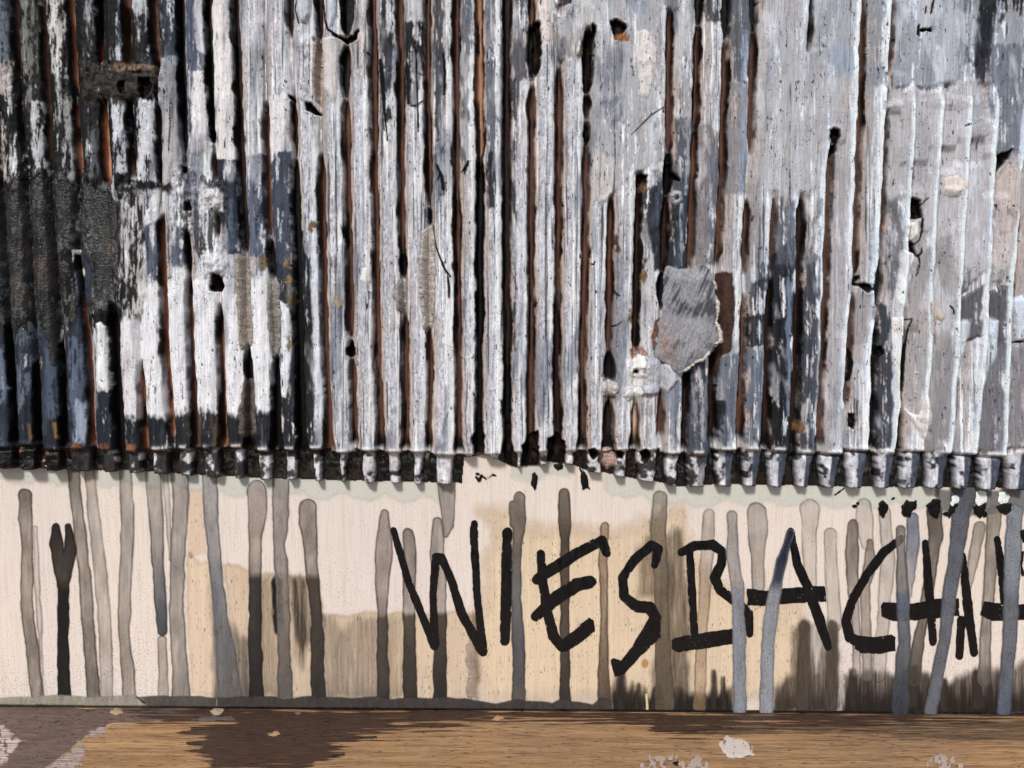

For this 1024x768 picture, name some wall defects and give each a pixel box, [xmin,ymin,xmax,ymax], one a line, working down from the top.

corrosion [258,256,298,307]
peeling [710,271,735,376]
water stain [125,531,1024,768]